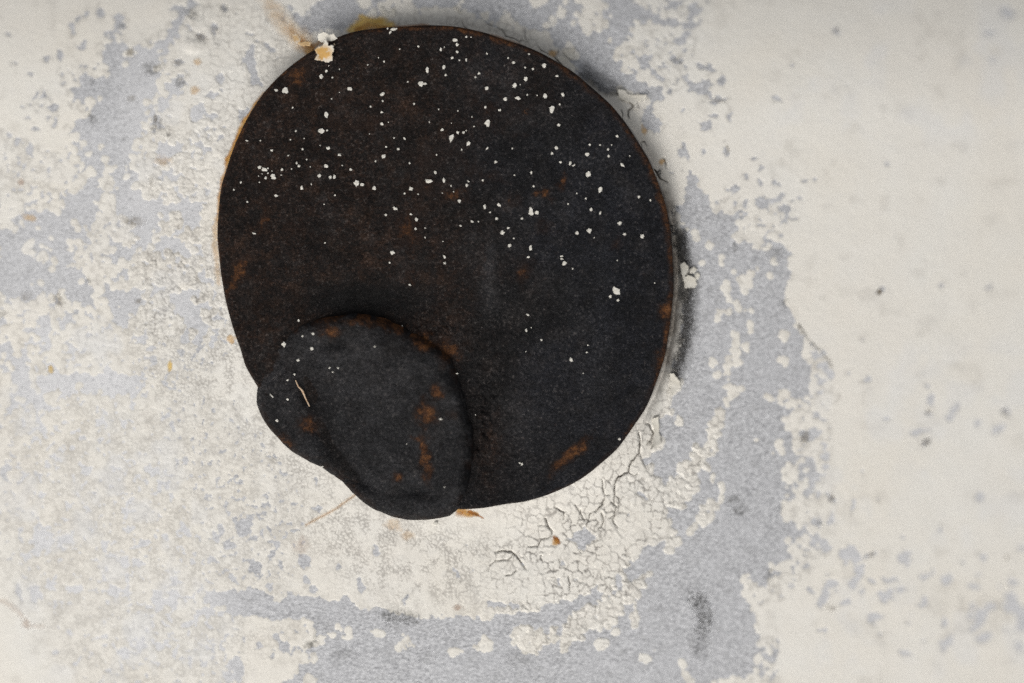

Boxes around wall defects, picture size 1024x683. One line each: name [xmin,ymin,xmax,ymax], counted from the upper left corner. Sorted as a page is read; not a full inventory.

corrosion [217,98,260,220]
peeling [238,106,251,122]
peeling [242,31,288,94]
peeling [258,112,376,190]
peeling [441,54,564,151]
peeling [281,0,733,133]
peeling [678,141,690,161]
peeling [0,0,237,467]
peeling [0,157,906,683]
peeling [910,384,960,447]
corrosion [457,509,484,519]
crack [489,423,654,576]